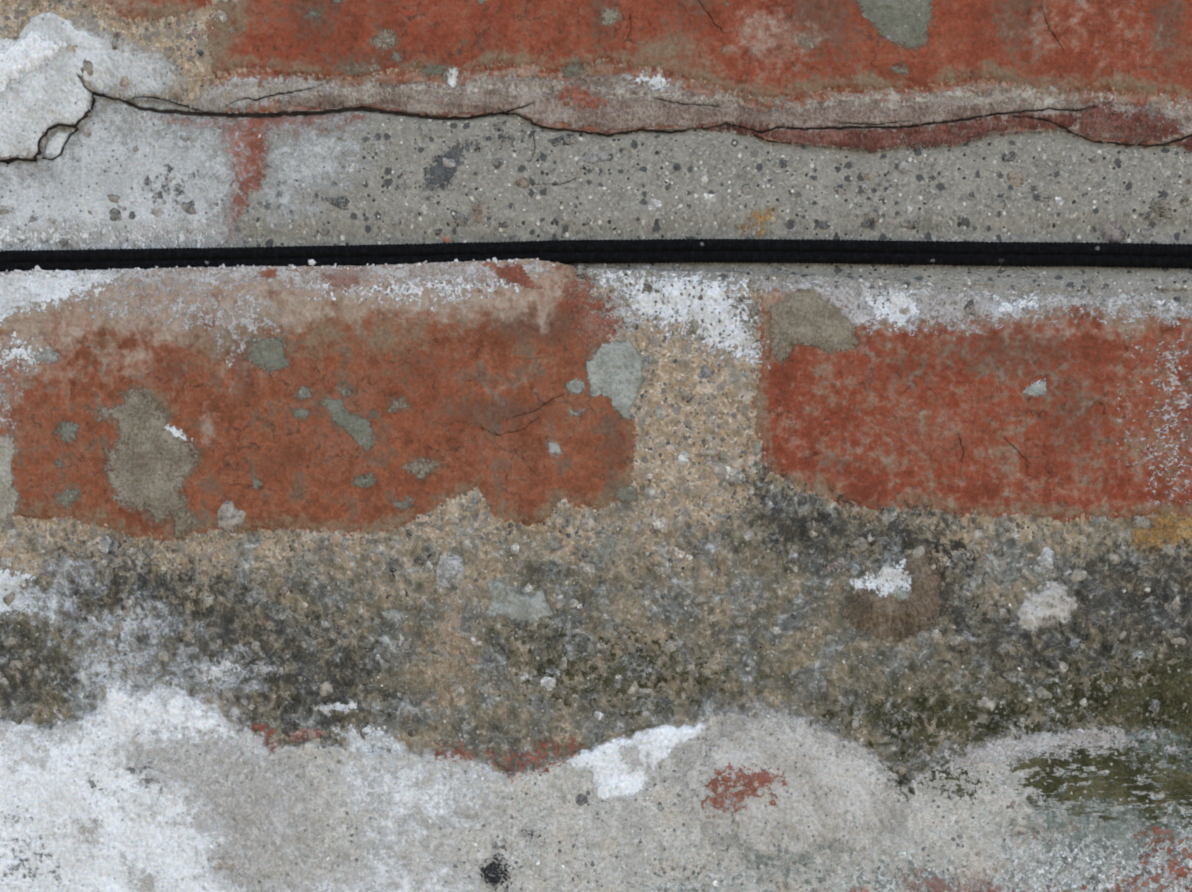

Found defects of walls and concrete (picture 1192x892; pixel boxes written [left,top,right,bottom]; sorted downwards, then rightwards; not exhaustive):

crack [0,77,1192,185]
peeling [918,726,1192,771]
peeling [899,811,1192,892]